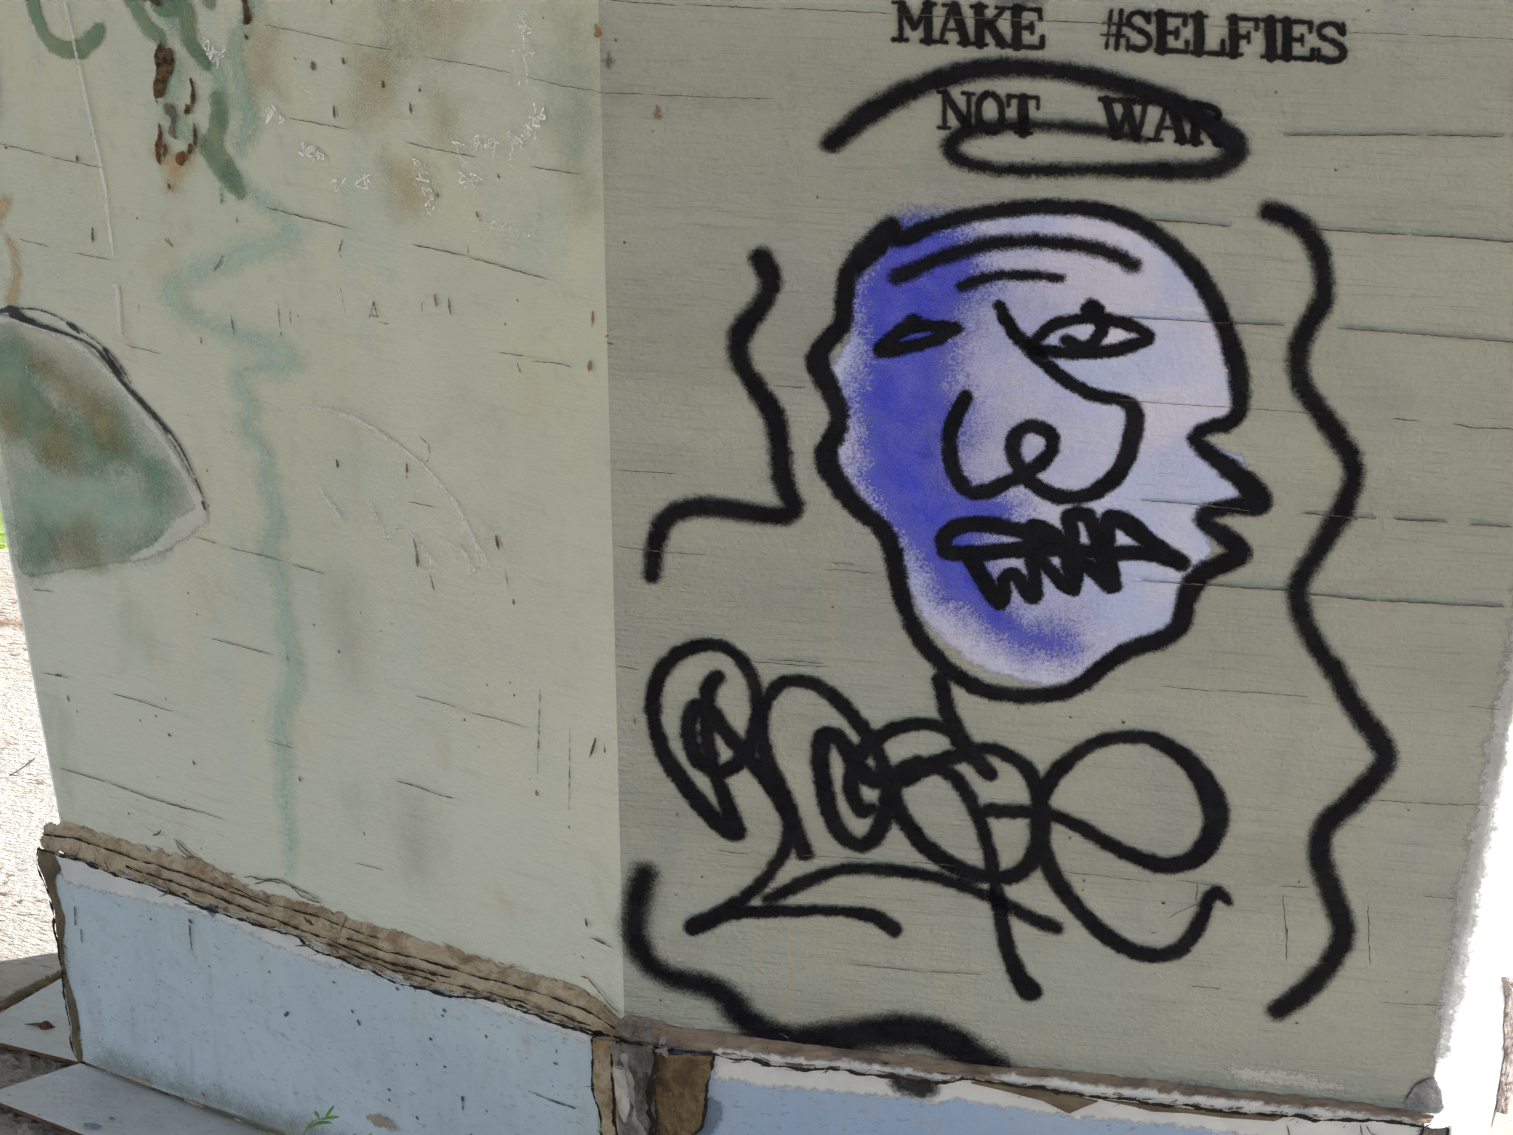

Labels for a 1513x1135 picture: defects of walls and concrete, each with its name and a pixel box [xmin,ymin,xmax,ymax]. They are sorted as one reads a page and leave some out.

peeling [613,1065,630,1123]
peeling [971,1082,1283,1121]